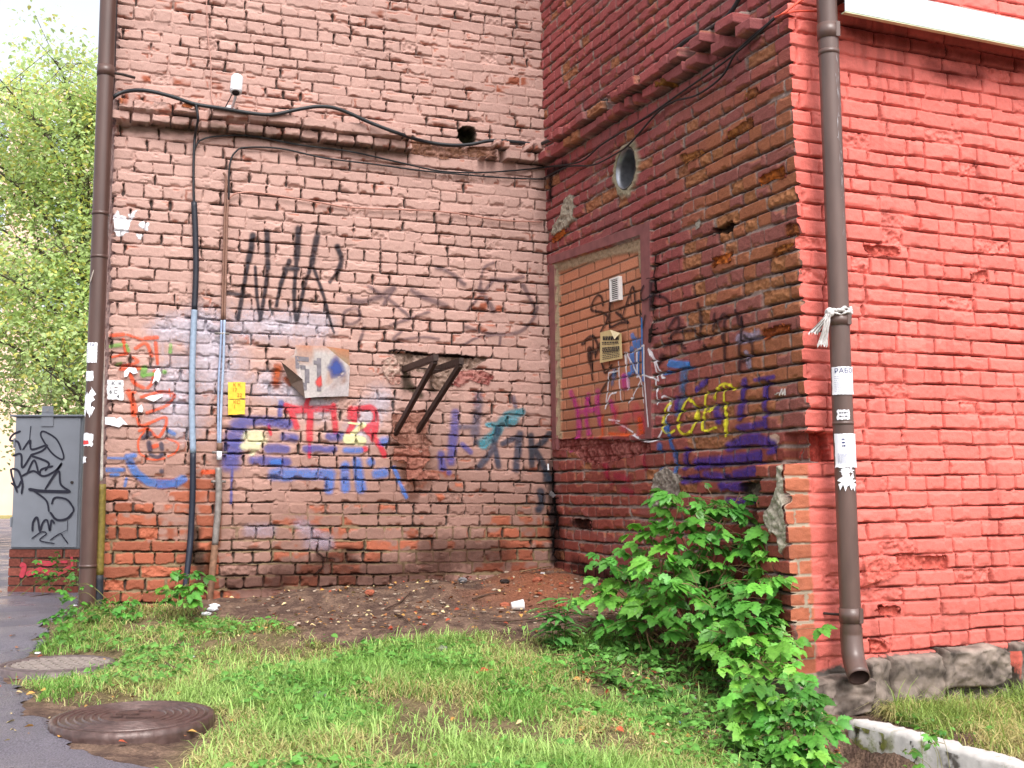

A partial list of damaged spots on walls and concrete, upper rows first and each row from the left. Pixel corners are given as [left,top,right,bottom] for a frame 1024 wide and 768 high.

spalling [716,223,737,234]
spalling [382,352,494,390]
spalling [577,519,593,530]
spalling [862,553,948,587]
spalling [867,637,892,653]